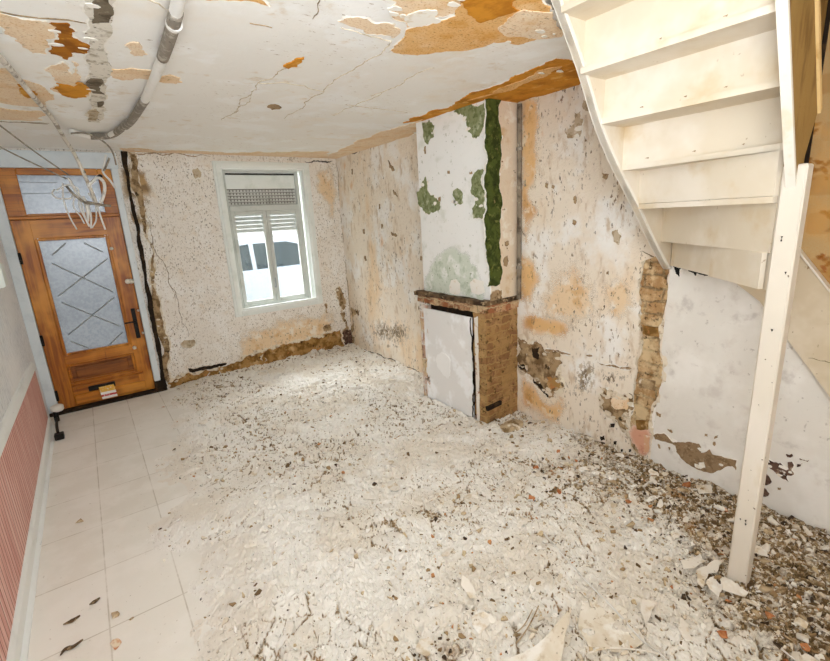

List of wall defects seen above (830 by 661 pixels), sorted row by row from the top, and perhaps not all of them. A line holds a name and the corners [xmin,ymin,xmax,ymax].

peeling [0,0,152,121]
crack [221,27,392,120]
peeling [338,0,563,55]
peeling [119,57,581,388]
crack [146,213,189,333]
damp [424,246,485,300]
flaking render [516,333,566,399]
peeling [598,256,738,473]
flaking render [763,454,810,497]